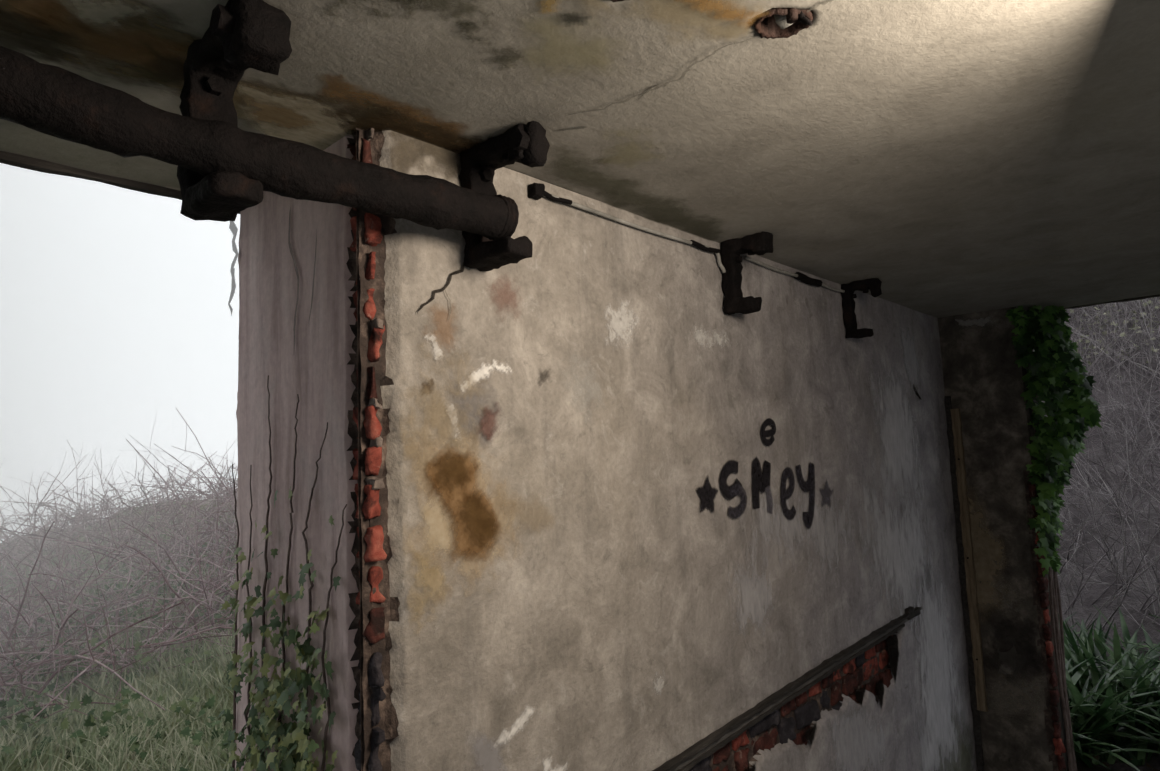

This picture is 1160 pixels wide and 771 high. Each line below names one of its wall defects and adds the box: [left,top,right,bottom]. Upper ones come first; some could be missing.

leakage [363,0,522,68]
rust [684,0,813,39]
crack [568,39,750,115]
spalling [347,128,380,166]
crack [417,262,465,320]
spalling [350,208,391,771]
spalling [688,634,899,771]